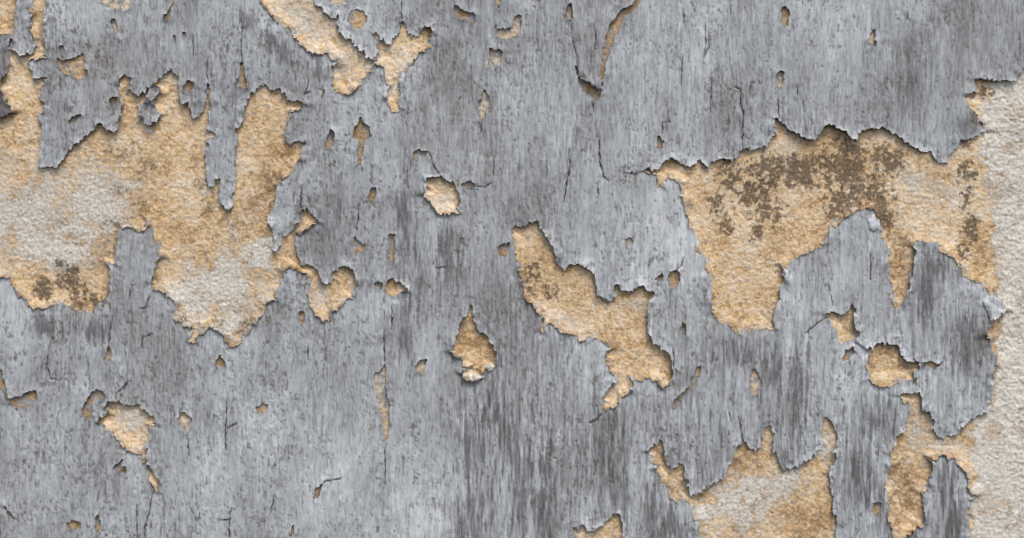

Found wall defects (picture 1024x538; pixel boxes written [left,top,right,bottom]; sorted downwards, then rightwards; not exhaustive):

peeling [0,0,438,367]
peeling [418,173,475,216]
peeling [447,301,502,382]
peeling [498,214,701,411]
peeling [631,65,1024,538]
peeling [82,389,166,493]